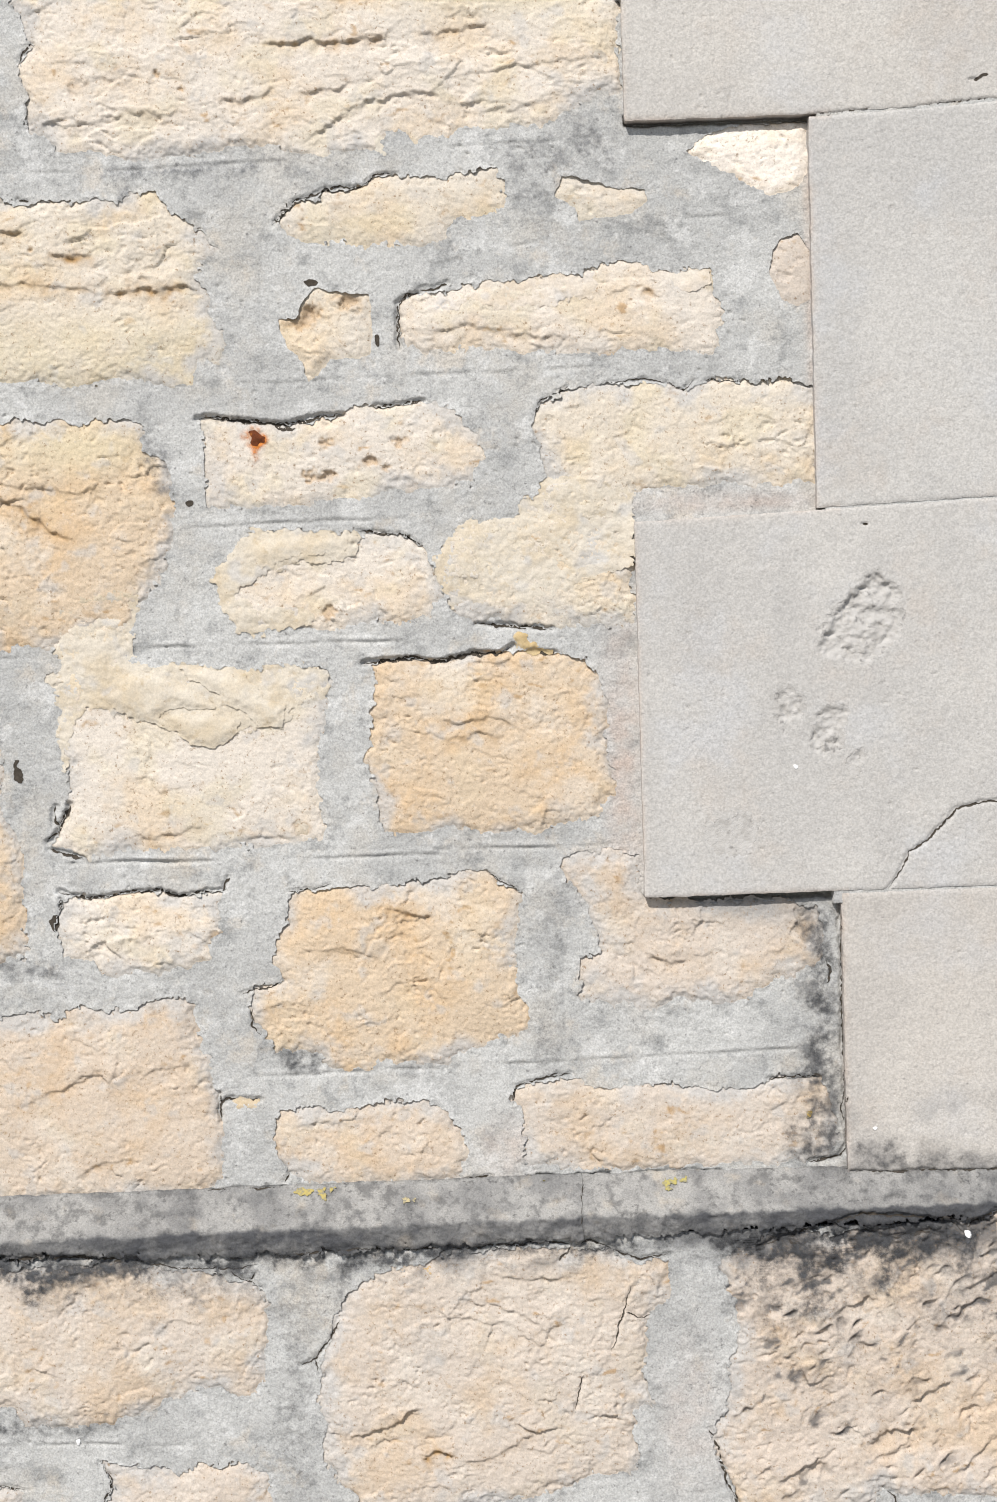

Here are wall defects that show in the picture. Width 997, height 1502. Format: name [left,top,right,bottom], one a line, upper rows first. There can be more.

rust [247,430,267,454]
spalling [815,569,907,667]
spalling [772,683,867,778]
crack [891,800,997,884]
damp [798,1264,817,1311]